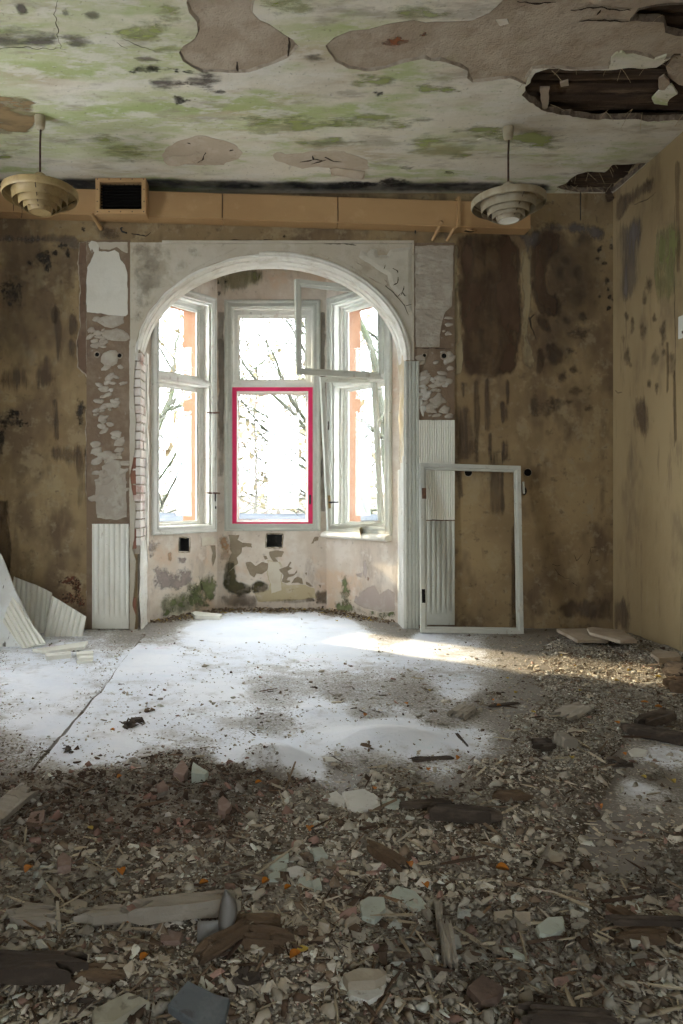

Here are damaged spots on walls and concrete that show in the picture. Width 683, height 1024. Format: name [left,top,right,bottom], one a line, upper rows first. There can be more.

peeling [0,96,37,133]
mould [0,35,84,46]
mould [129,57,225,104]
peeling [162,135,243,166]
flaking render [179,0,298,73]
peeling [273,151,369,179]
flaking render [326,0,683,122]
leakage [2,314,76,387]
leakage [455,180,652,513]
leakage [52,400,86,473]
leakage [0,501,11,574]
flaking render [201,534,322,602]